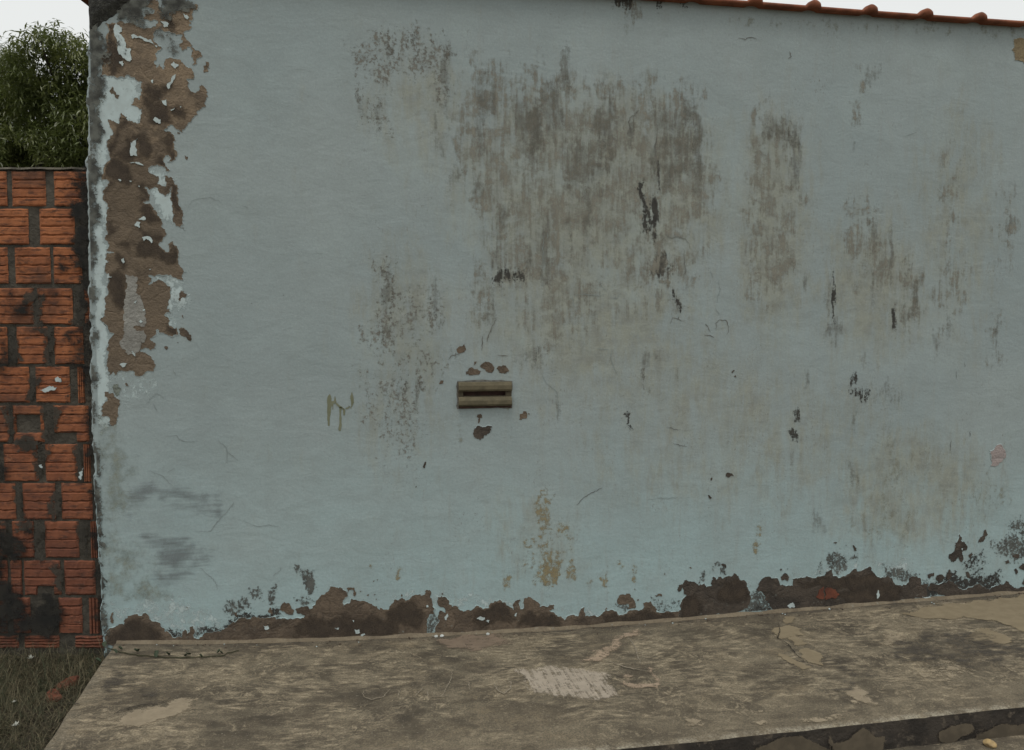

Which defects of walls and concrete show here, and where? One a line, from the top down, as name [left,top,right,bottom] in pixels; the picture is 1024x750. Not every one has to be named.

damp [352,27,457,138]
peeling [100,0,209,426]
damp [453,59,720,351]
damp [358,261,445,458]
peeling [466,361,509,375]
flaking render [472,414,493,440]
damp [0,529,64,641]
peeling [104,530,1024,647]
damp [778,520,1024,597]